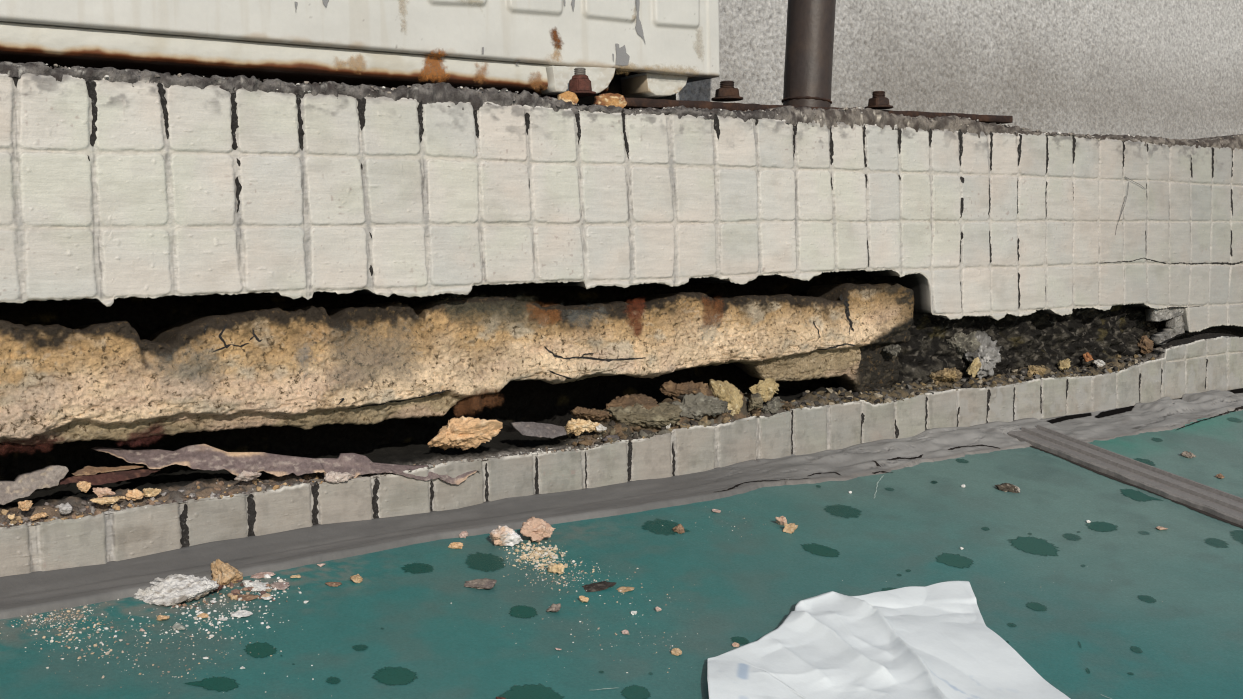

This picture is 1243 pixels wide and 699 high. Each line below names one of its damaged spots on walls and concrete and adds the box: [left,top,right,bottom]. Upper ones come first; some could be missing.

crack [1104,257,1243,265]
corrosion [629,300,644,335]
crack [544,346,645,379]
spalling [0,272,1201,527]
crack [1177,406,1243,430]